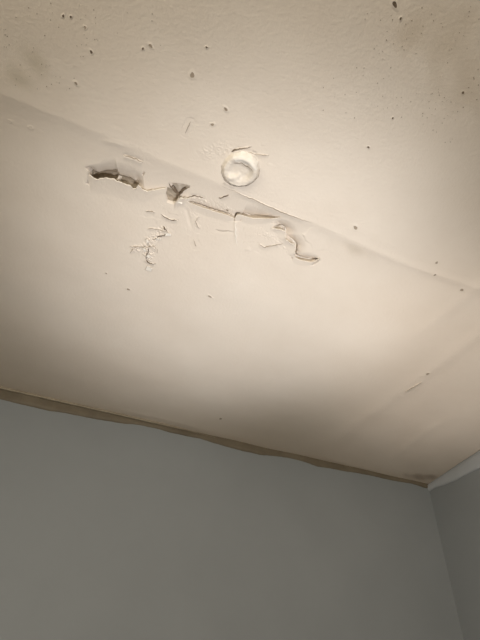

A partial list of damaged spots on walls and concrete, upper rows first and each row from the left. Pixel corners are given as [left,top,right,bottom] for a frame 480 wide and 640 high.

hole [92,168,139,188]
peeling [123,220,175,272]
peeling [166,183,332,270]
crack [188,182,319,227]